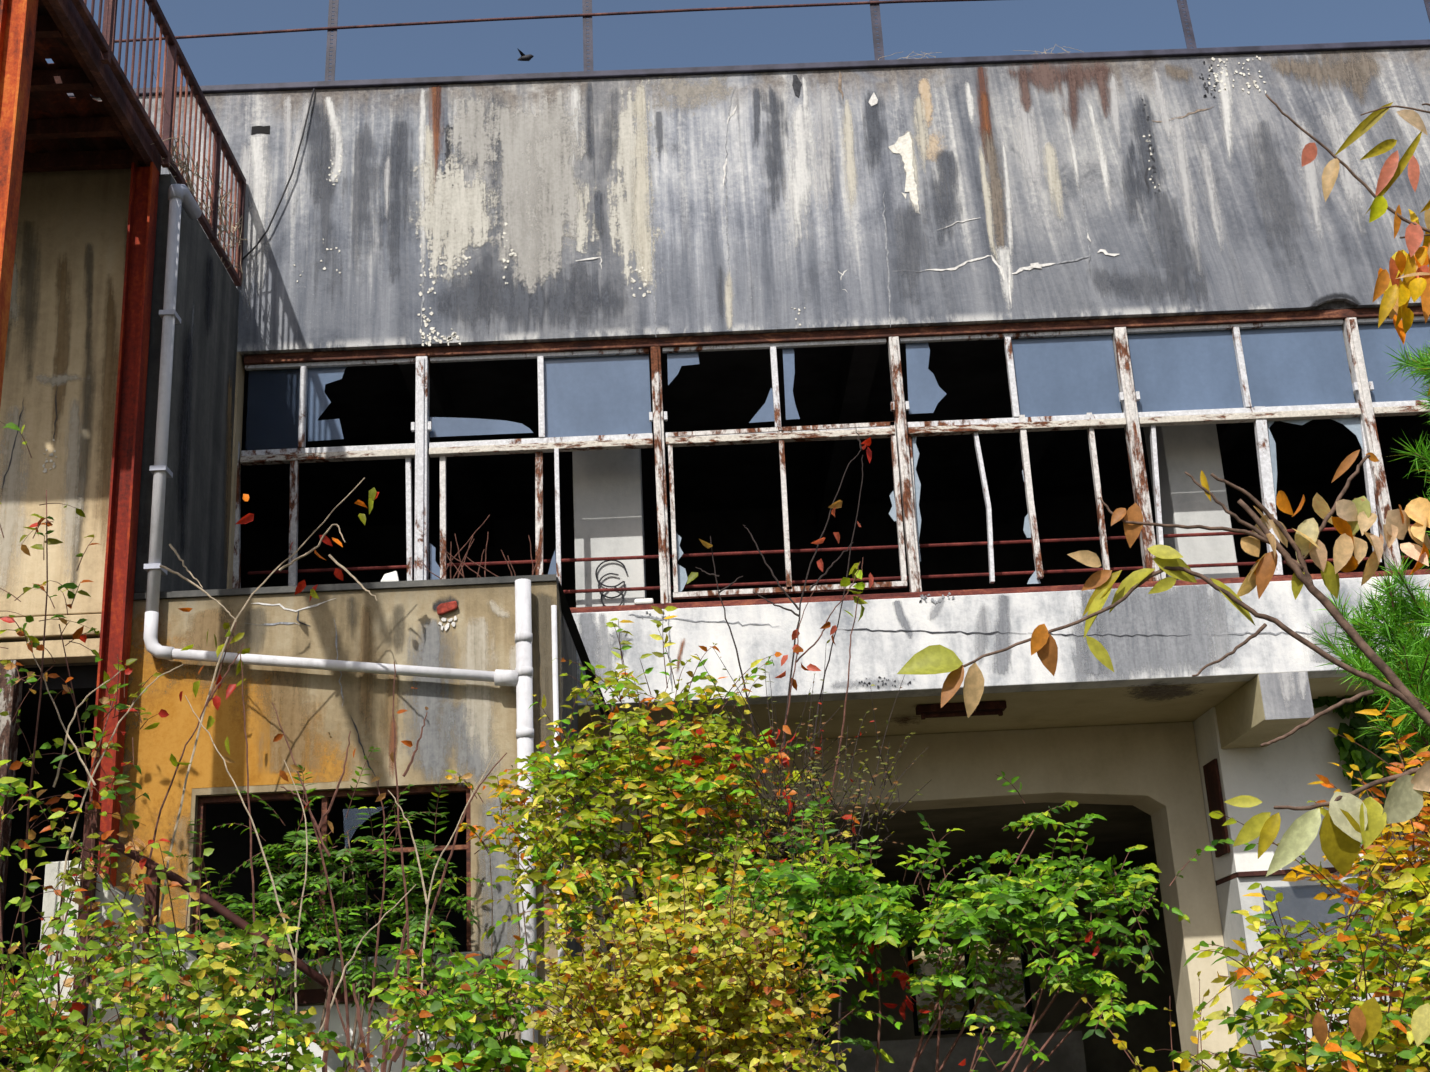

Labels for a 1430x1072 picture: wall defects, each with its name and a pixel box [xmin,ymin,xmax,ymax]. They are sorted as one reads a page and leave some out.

water stain [241,136,269,292]
water stain [285,90,426,290]
water stain [753,70,887,242]
peeling [888,78,942,214]
rust [978,67,1005,251]
crack [903,180,1119,302]
water stain [980,103,1078,308]
rust [1009,62,1110,127]
water stain [1088,64,1220,300]
rust [53,259,70,438]
rust [96,281,118,528]
spalling [433,598,458,631]